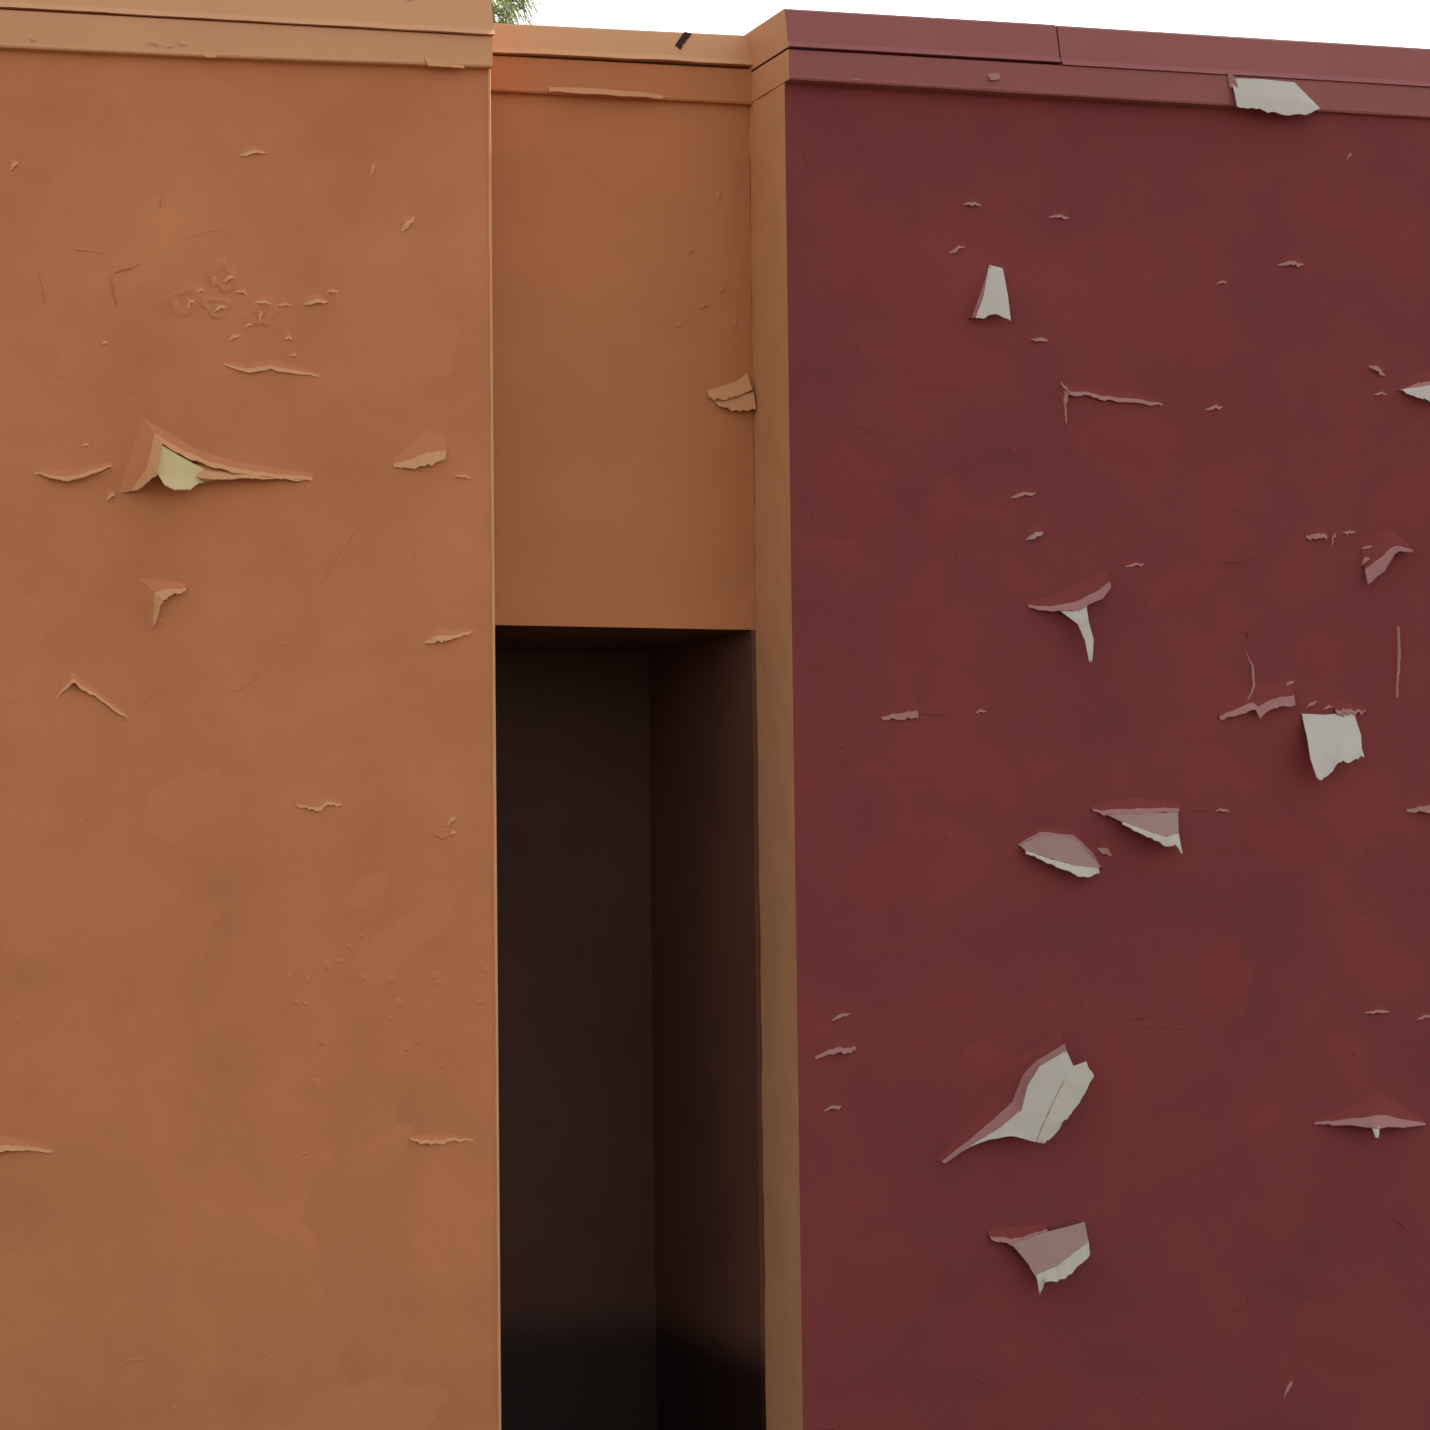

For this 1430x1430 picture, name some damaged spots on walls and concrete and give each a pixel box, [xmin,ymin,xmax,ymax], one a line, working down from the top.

peeling [1228,71,1320,116]
peeling [966,264,1011,321]
peeling [707,374,756,411]
peeling [33,418,313,501]
peeling [1305,525,1413,585]
peeling [1026,571,1111,662]
peeling [1217,677,1366,780]
peeling [1017,827,1112,878]
peeling [1089,797,1183,854]
peeling [936,1029,1094,1163]
peeling [1314,1090,1426,1138]
peeling [986,1222,1090,1294]